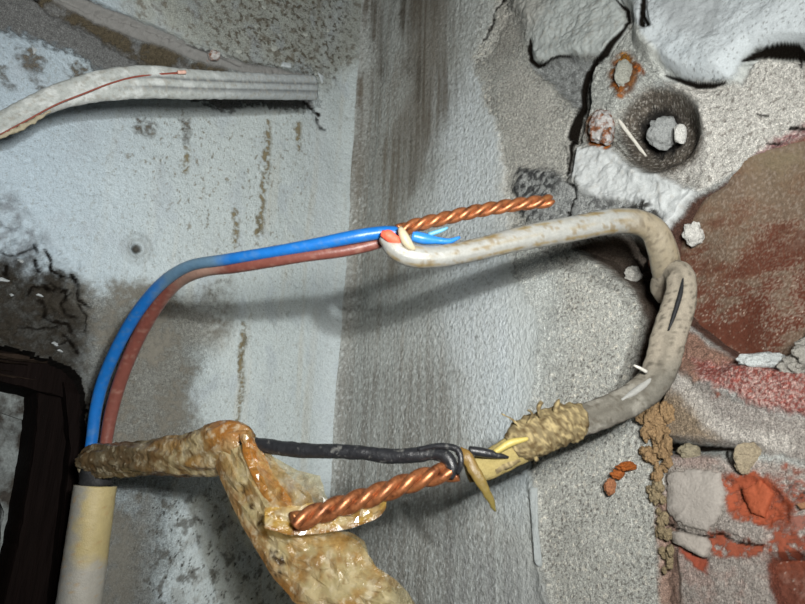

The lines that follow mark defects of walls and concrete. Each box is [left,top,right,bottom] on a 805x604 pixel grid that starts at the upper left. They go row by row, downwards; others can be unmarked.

flaking render [530,56,594,108]
corrosion [609,53,644,98]
flaking render [664,58,805,193]
crack [2,245,87,354]
flaking render [513,248,643,413]
flaking render [529,400,805,604]